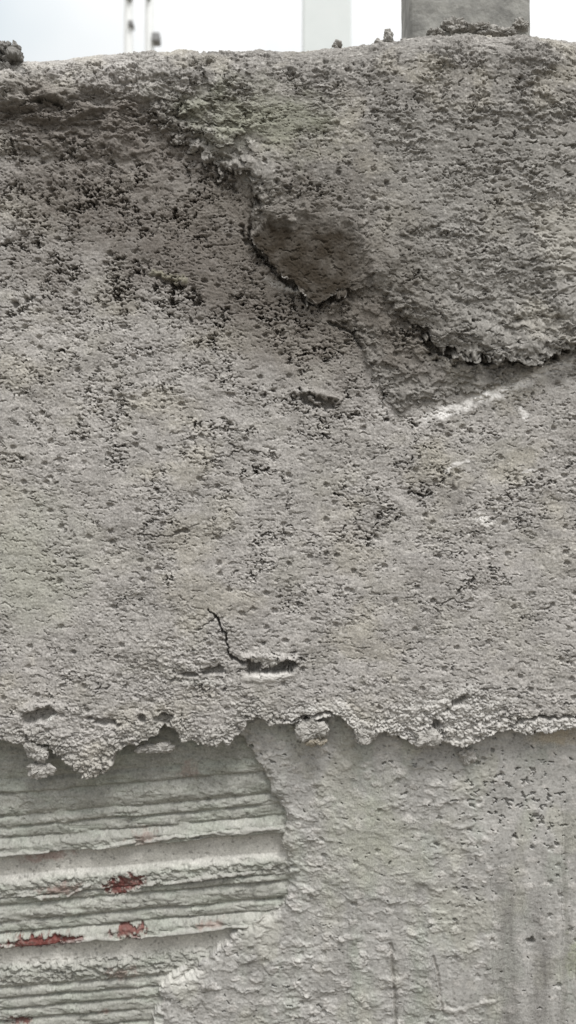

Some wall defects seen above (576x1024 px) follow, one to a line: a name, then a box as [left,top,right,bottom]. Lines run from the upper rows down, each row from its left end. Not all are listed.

crack [198,608,246,666]
flaking render [122,823,162,849]
flaking render [4,850,159,901]
flaking render [0,926,85,952]
flaking render [107,919,156,941]
flaking render [102,960,145,985]
flaking render [3,1015,34,1024]